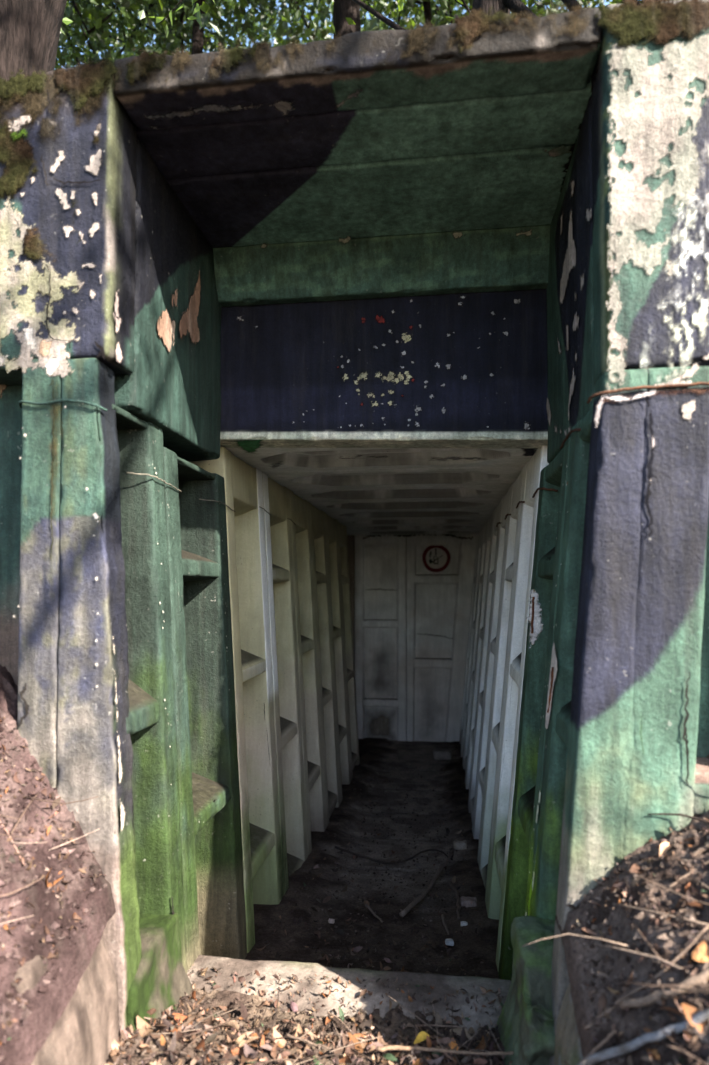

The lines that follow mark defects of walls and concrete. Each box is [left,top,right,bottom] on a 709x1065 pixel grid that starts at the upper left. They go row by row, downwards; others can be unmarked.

peeling [9,116,31,132]
peeling [50,150,65,173]
peeling [85,148,102,175]
peeling [0,177,102,397]
peeling [157,271,201,352]
peeling [560,210,584,303]
peeling [595,33,709,427]
peeling [337,310,445,428]
peeling [546,312,579,436]
crack [644,397,655,537]
spalling [528,590,543,644]
spalling [543,644,557,729]